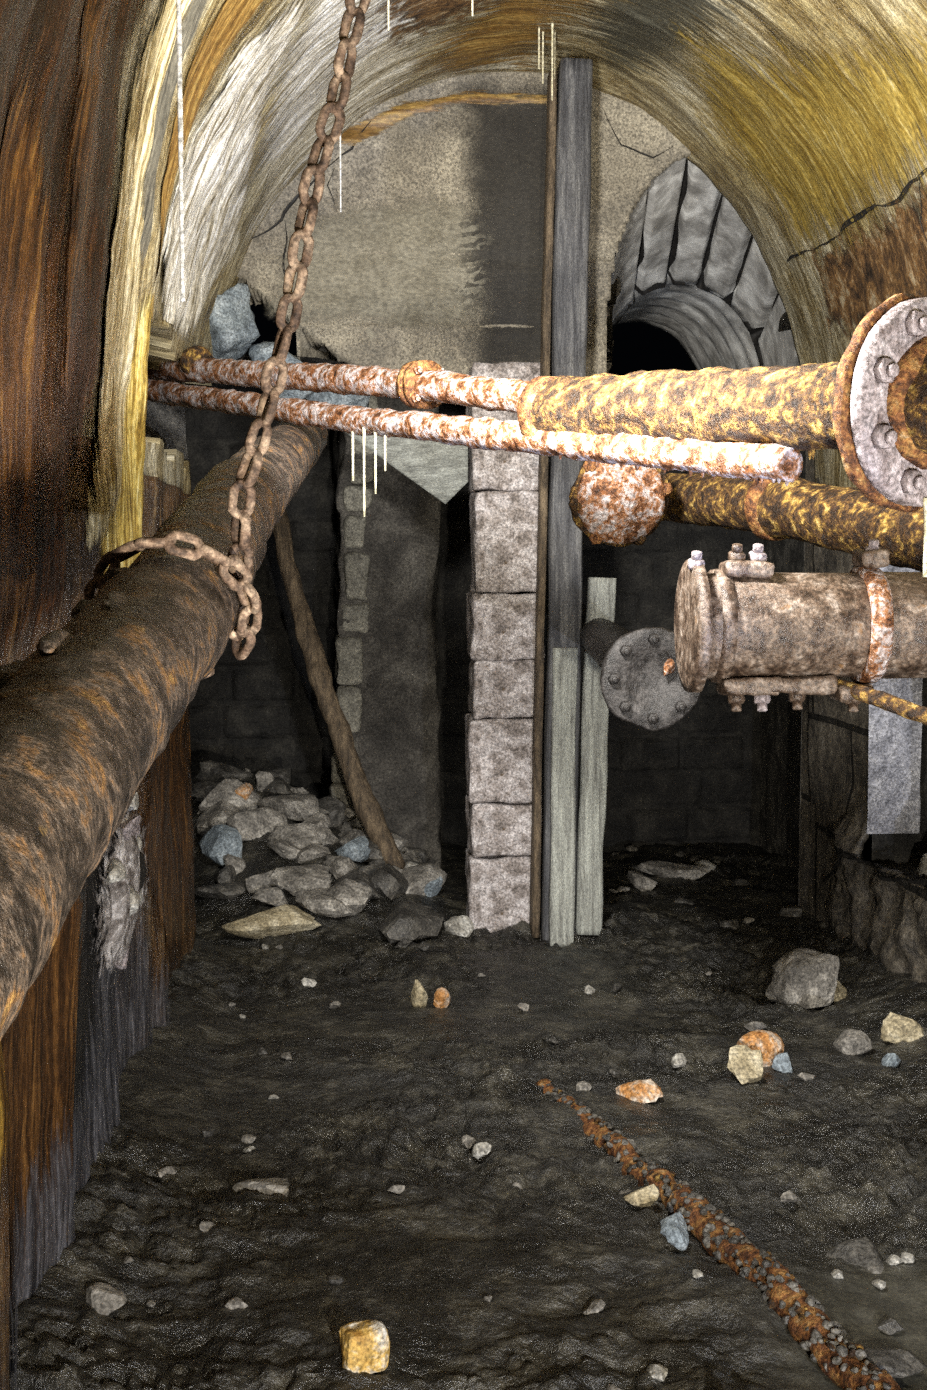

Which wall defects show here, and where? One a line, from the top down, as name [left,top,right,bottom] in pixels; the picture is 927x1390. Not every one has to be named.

leakage [86,0,551,573]
crack [787,168,927,262]
leakage [1,831,169,1390]